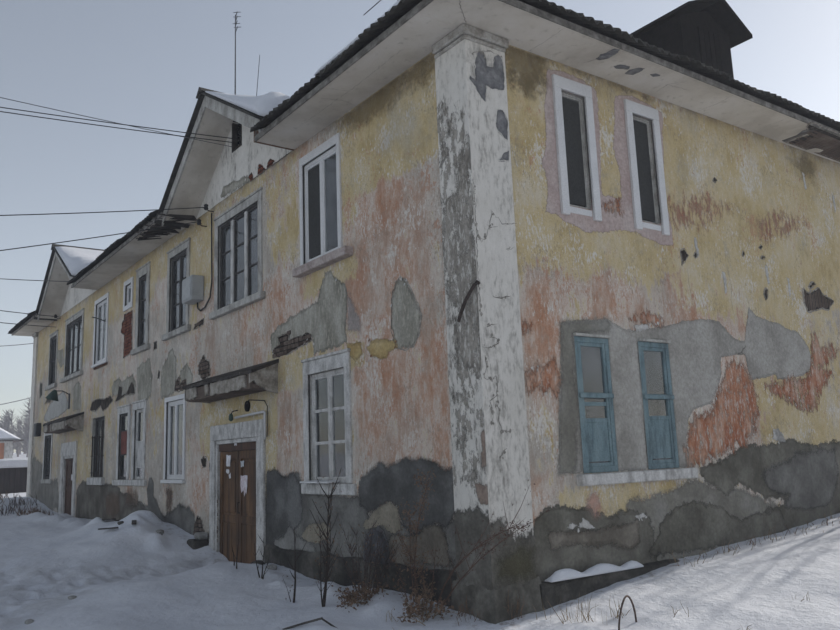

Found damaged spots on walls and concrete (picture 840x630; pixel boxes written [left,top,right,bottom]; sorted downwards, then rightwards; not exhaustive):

peeling [468,50,505,103]
peeling [596,49,660,77]
peeling [495,109,510,162]
spalling [782,122,840,162]
spalling [121,310,133,359]
peeling [270,270,422,361]
spalling [802,281,834,313]
peeling [44,341,211,422]
peeling [524,308,839,473]
damp [31,455,59,512]
damp [76,477,195,535]
damp [265,438,840,590]